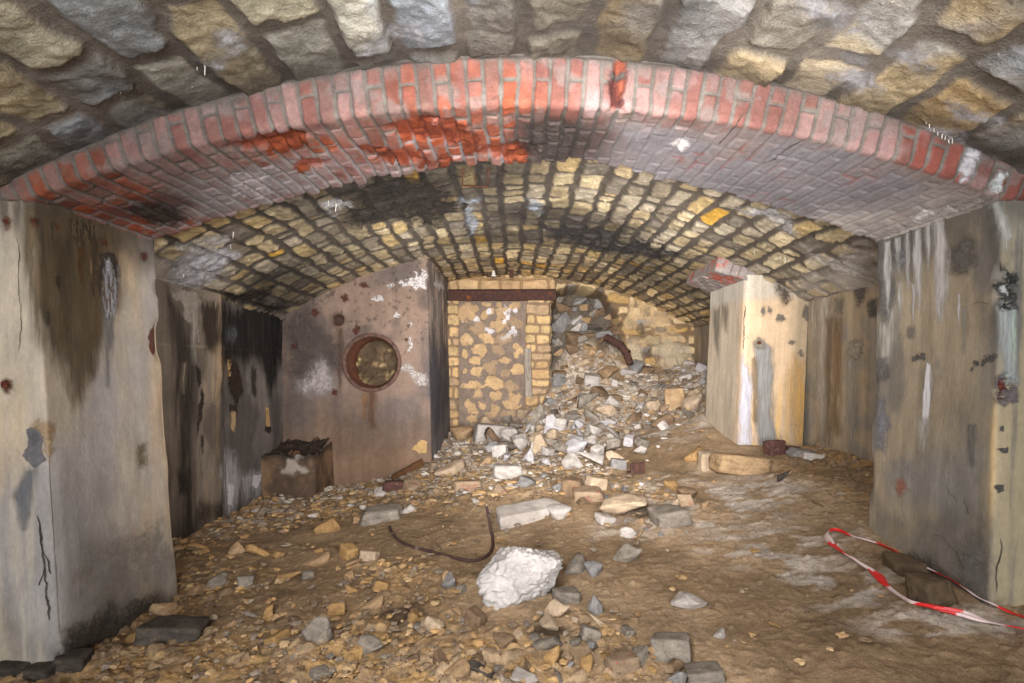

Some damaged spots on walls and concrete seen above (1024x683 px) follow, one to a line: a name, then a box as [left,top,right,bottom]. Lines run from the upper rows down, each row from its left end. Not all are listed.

spalling [608,71,626,108]
spalling [410,116,480,172]
spalling [505,143,528,164]
water stain [924,128,980,183]
water stain [24,203,121,401]
water stain [169,235,240,288]
water stain [168,297,262,538]
water stain [299,360,333,394]
water stain [805,171,1011,380]
spalling [993,269,1020,383]
spalling [14,421,55,529]
crack [37,517,51,620]